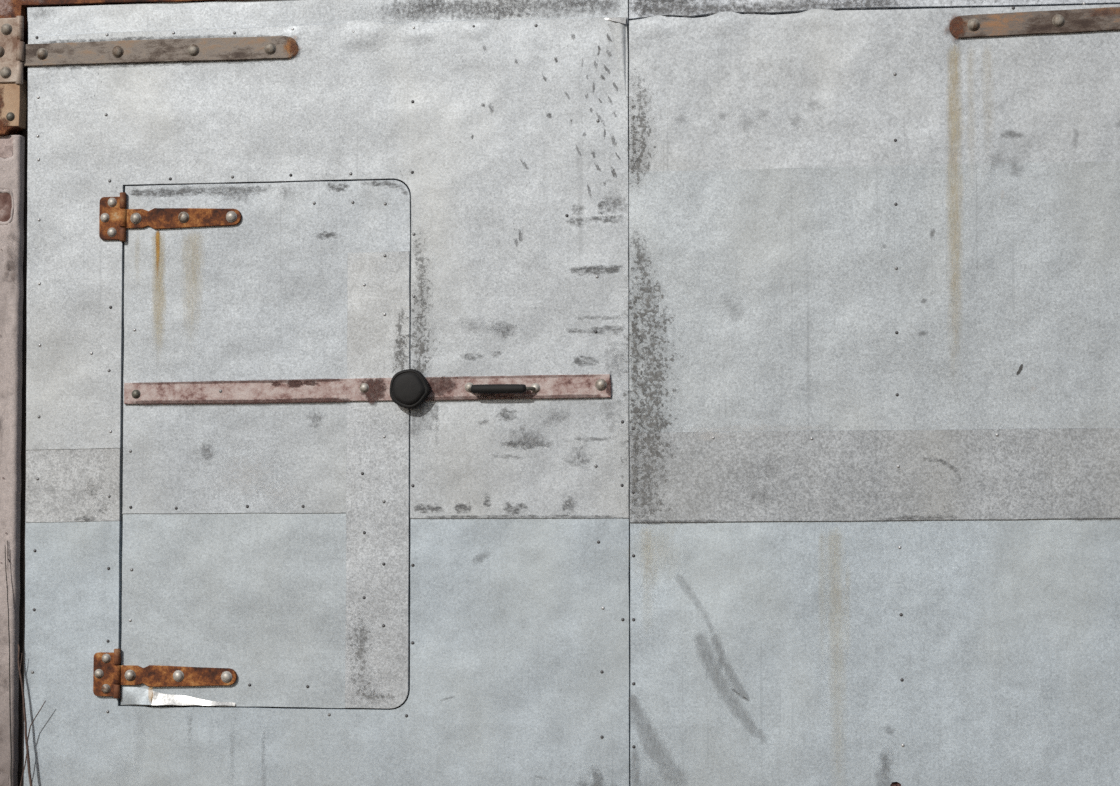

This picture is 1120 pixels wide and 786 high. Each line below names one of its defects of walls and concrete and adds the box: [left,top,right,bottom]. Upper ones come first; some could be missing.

rust [0,0,11,14]
rust [630,0,888,17]